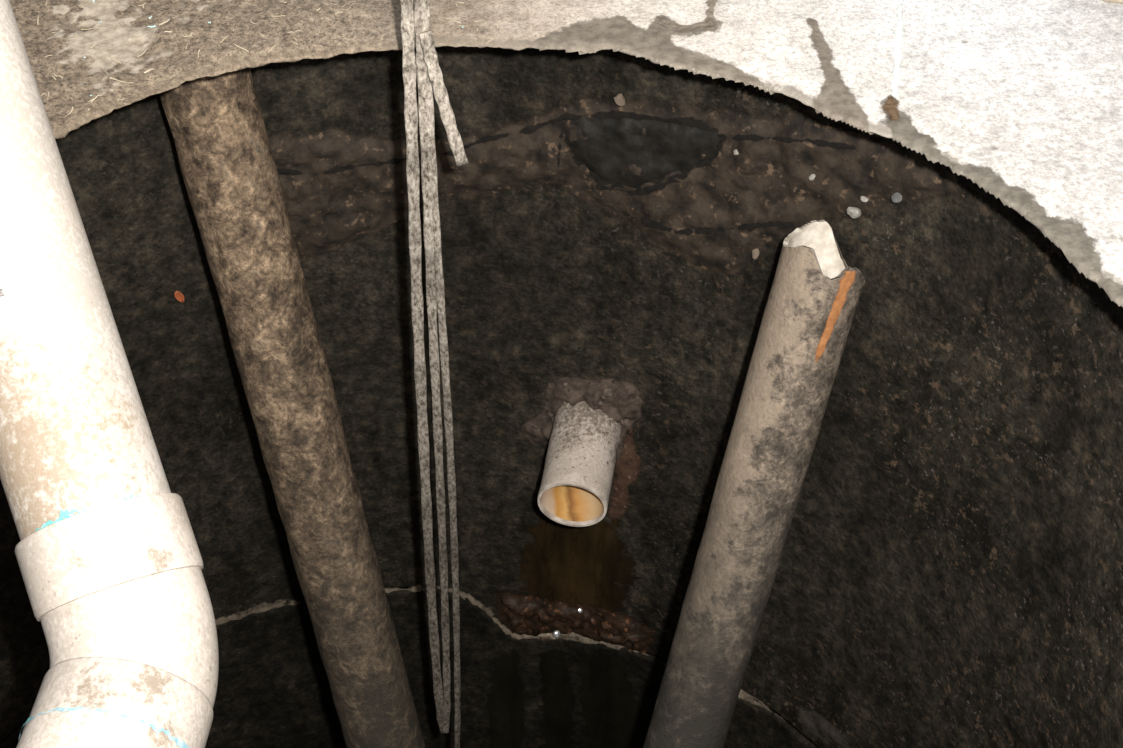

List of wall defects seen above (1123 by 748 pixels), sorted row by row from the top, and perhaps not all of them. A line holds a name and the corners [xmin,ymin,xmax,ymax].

crack [278,111,856,235]
rust [883,96,899,120]
leakage [806,0,1123,307]